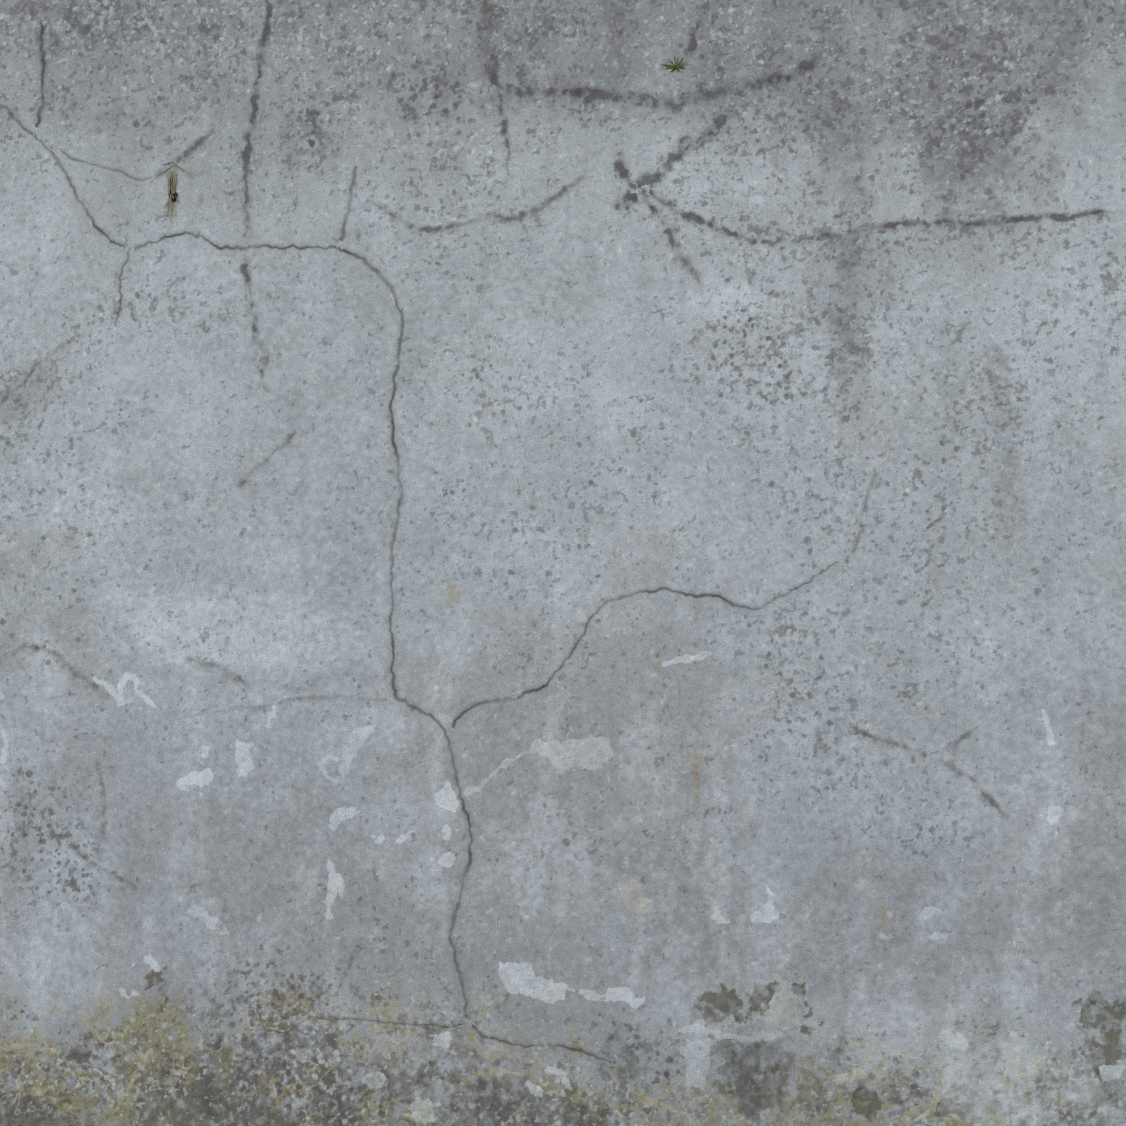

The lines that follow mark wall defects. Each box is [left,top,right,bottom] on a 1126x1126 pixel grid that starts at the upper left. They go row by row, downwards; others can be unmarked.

crack [0,17,218,332]
crack [469,0,1123,291]
crack [129,0,904,1126]
crack [0,639,111,700]
peeling [91,671,156,709]
crack [66,755,139,892]
peeling [175,745,215,792]
peeling [324,858,345,921]
peeling [433,731,615,868]
spalling [496,961,825,1126]
water stain [931,1038,1126,1126]
spalling [1069,989,1126,1089]